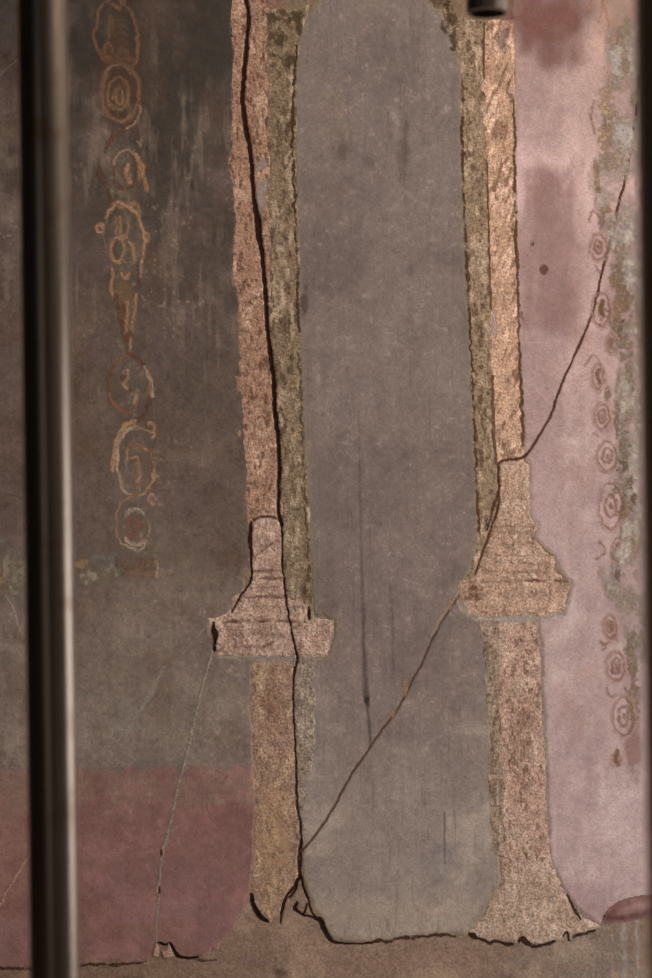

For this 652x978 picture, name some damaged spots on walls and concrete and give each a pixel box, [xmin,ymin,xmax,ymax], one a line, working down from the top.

flaking render [231,4,315,624]
crack [240,0,459,945]
spalling [512,99,525,446]
crack [475,240,610,575]
crack [615,155,631,217]
crack [155,629,218,943]
flaking render [290,655,316,841]
flaking render [479,617,507,858]
spalling [250,893,269,923]
spalling [371,933,456,944]
spalling [468,929,596,948]